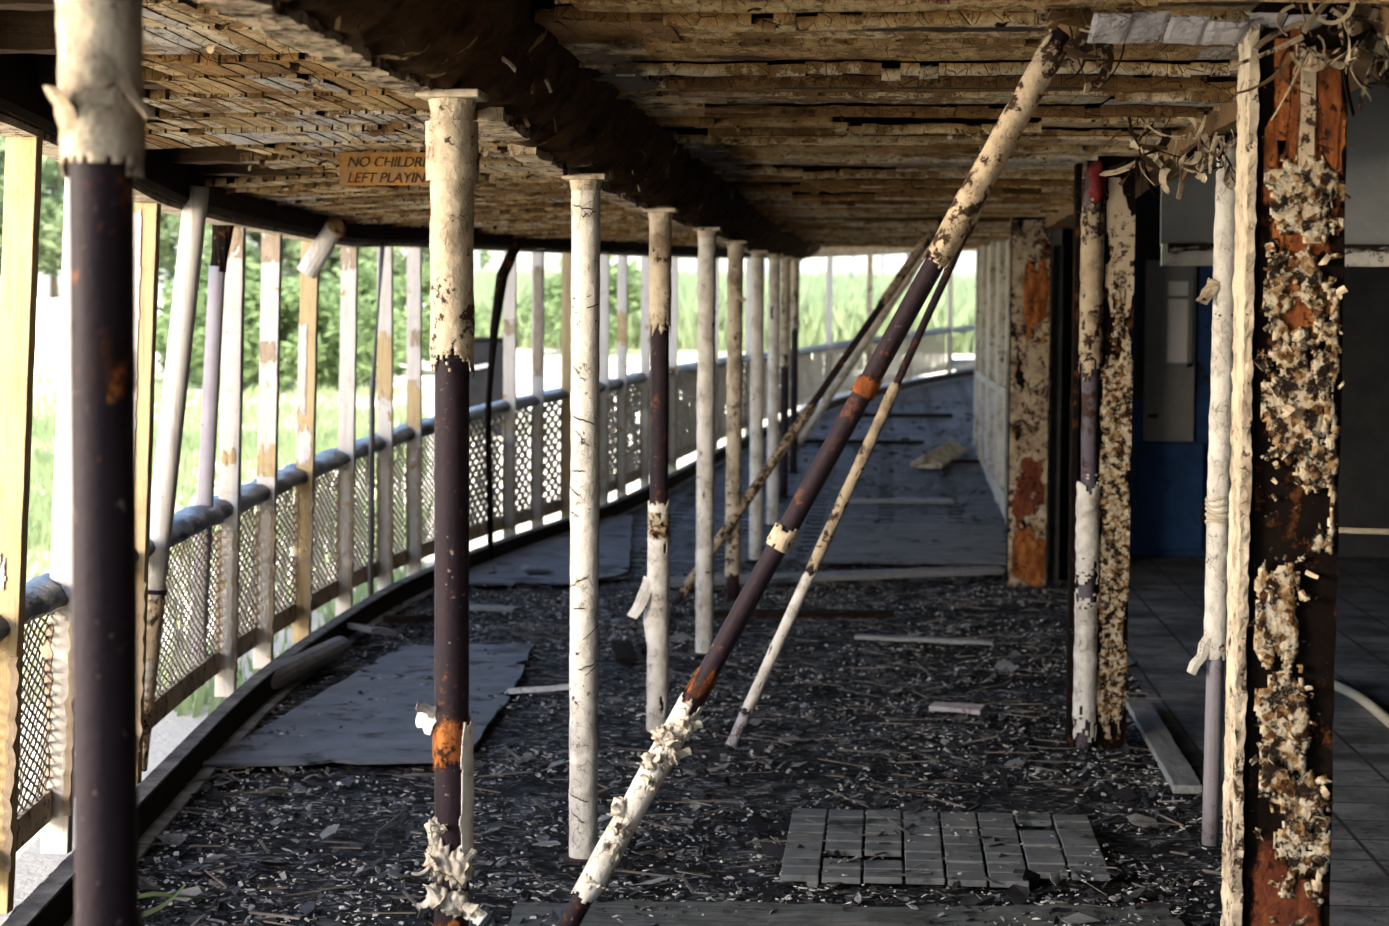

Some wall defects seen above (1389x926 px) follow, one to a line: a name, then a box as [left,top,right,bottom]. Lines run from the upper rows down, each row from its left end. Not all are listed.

peeling [1087,2,1327,46]
rust [1263,28,1346,346]
peeling [377,141,508,429]
peeling [459,22,1222,926]
rust [1011,446,1045,587]
peeling [1187,148,1237,675]
peeling [1245,155,1351,926]
peeling [415,702,436,735]
rust [432,716,471,770]
rust [682,668,721,706]
peeling [139,767,433,926]
rust [1251,836,1319,926]